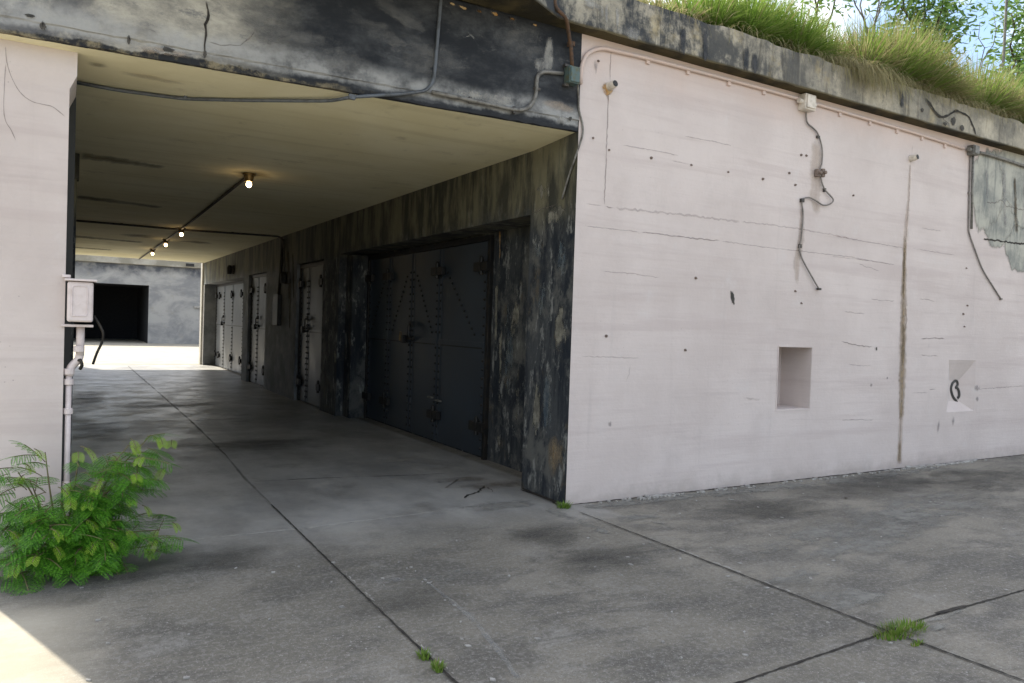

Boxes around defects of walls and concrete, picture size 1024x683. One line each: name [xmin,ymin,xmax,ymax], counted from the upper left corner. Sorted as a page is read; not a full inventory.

crack [202,3,210,57]
leakage [536,40,553,69]
leakage [744,48,759,73]
leakage [460,90,510,104]
crack [927,99,976,134]
peeling [973,149,1024,272]